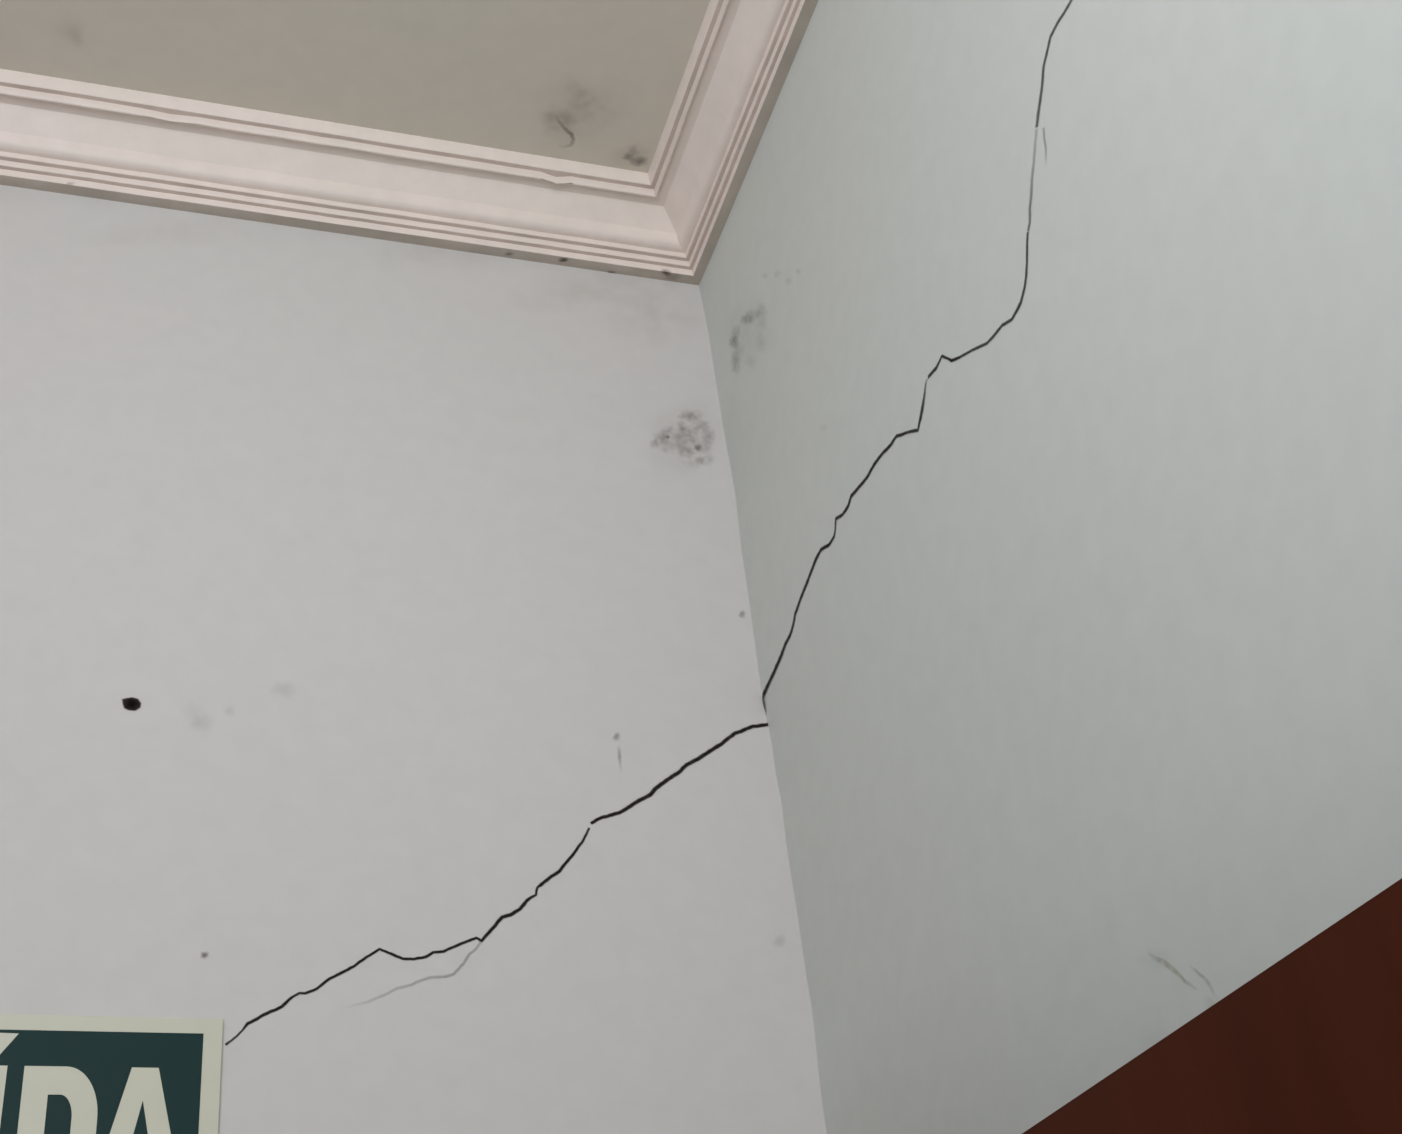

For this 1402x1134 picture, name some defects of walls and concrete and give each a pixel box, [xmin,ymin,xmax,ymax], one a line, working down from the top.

crack [1035,0,1072,128]
crack [225,232,1028,1045]